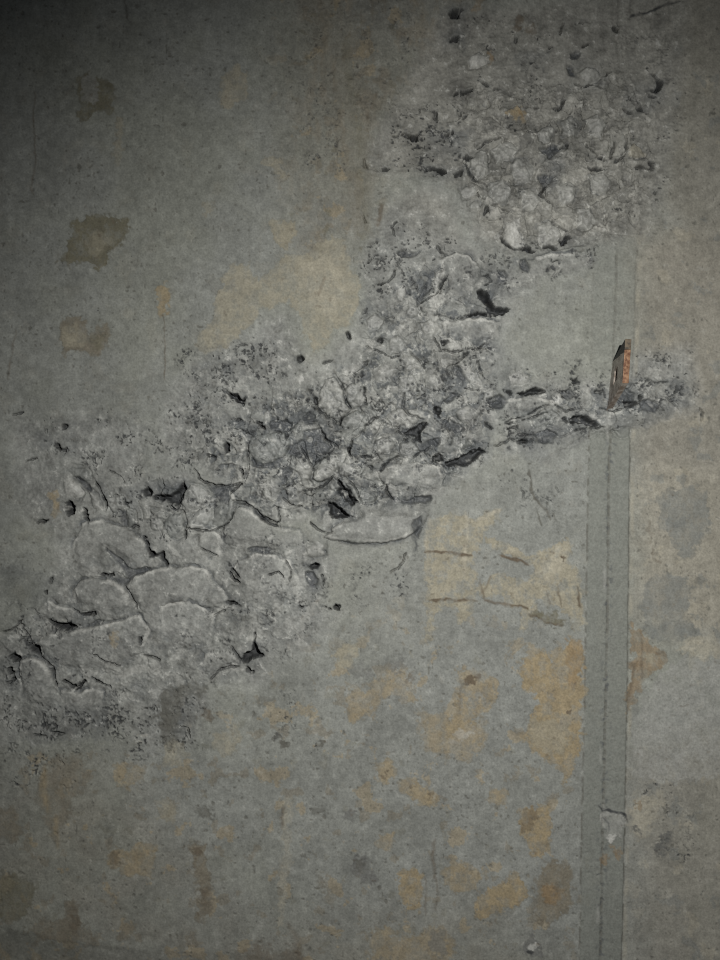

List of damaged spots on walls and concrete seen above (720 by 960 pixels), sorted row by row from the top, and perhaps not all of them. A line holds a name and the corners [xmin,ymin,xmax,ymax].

peeling [73,69,119,123]
peeling [58,314,112,361]
crack [387,495,531,611]
peeling [636,483,715,647]